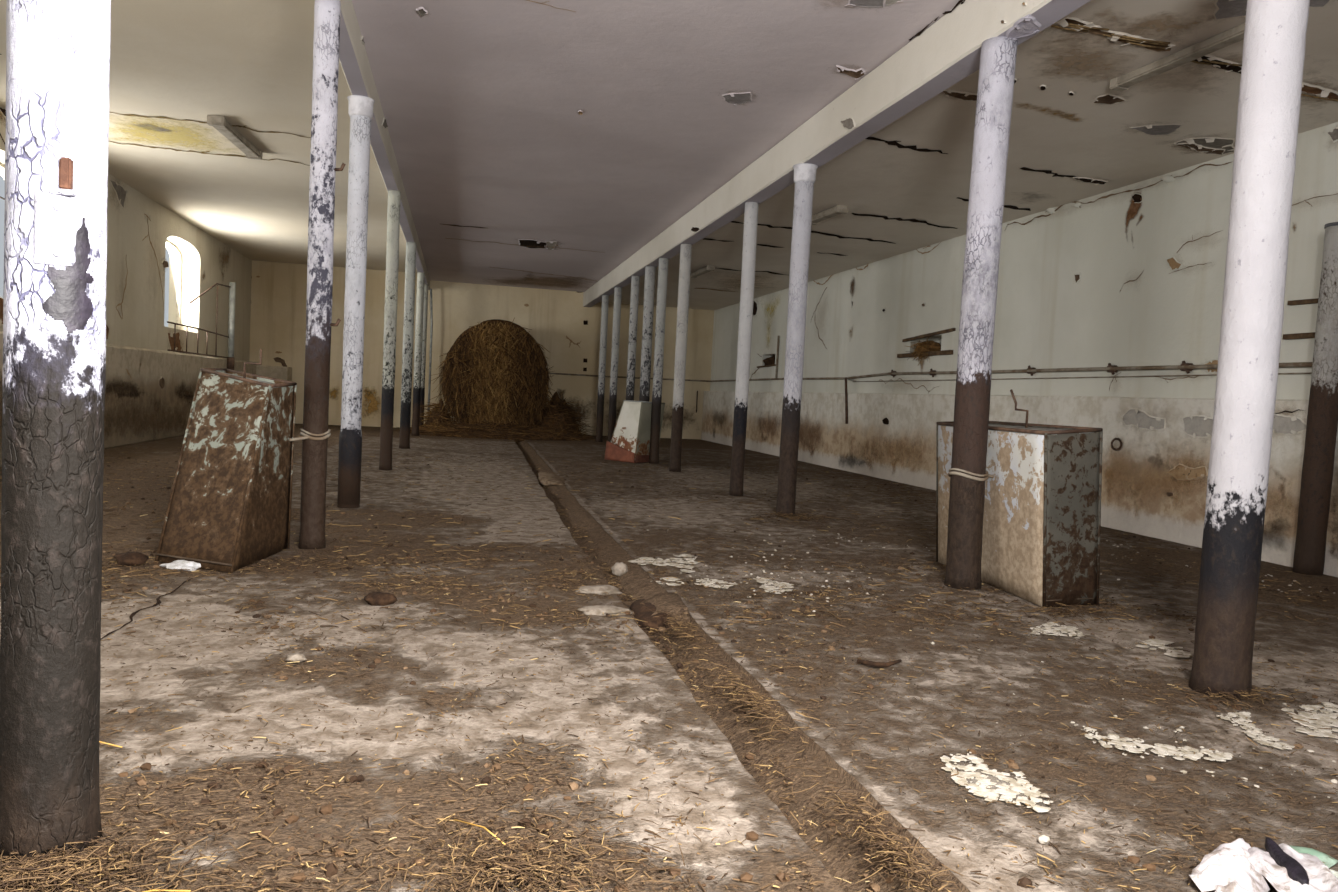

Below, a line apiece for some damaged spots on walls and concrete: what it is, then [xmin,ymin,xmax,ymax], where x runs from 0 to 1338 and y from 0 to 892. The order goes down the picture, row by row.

peeling [1212,0,1247,19]
crack [866,137,947,154]
flaking render [1129,124,1235,155]
crack [1004,162,1231,230]
rust [1126,193,1142,230]
peeling [43,218,94,332]
crack [694,197,969,349]
water stain [104,381,193,434]
crack [101,580,189,640]